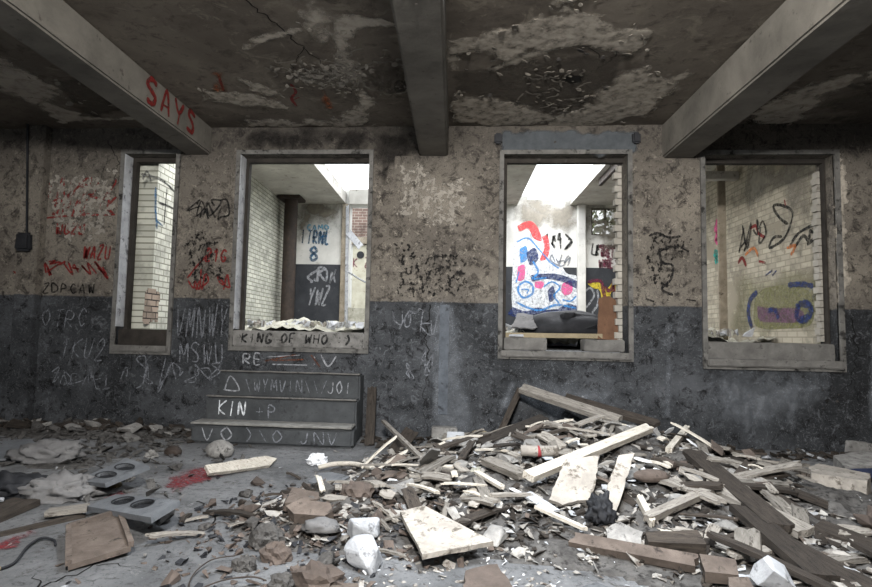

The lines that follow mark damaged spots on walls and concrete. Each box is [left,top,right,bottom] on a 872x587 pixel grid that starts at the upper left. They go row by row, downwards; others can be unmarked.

peeling [0,58,135,124]
crack [246,0,380,100]